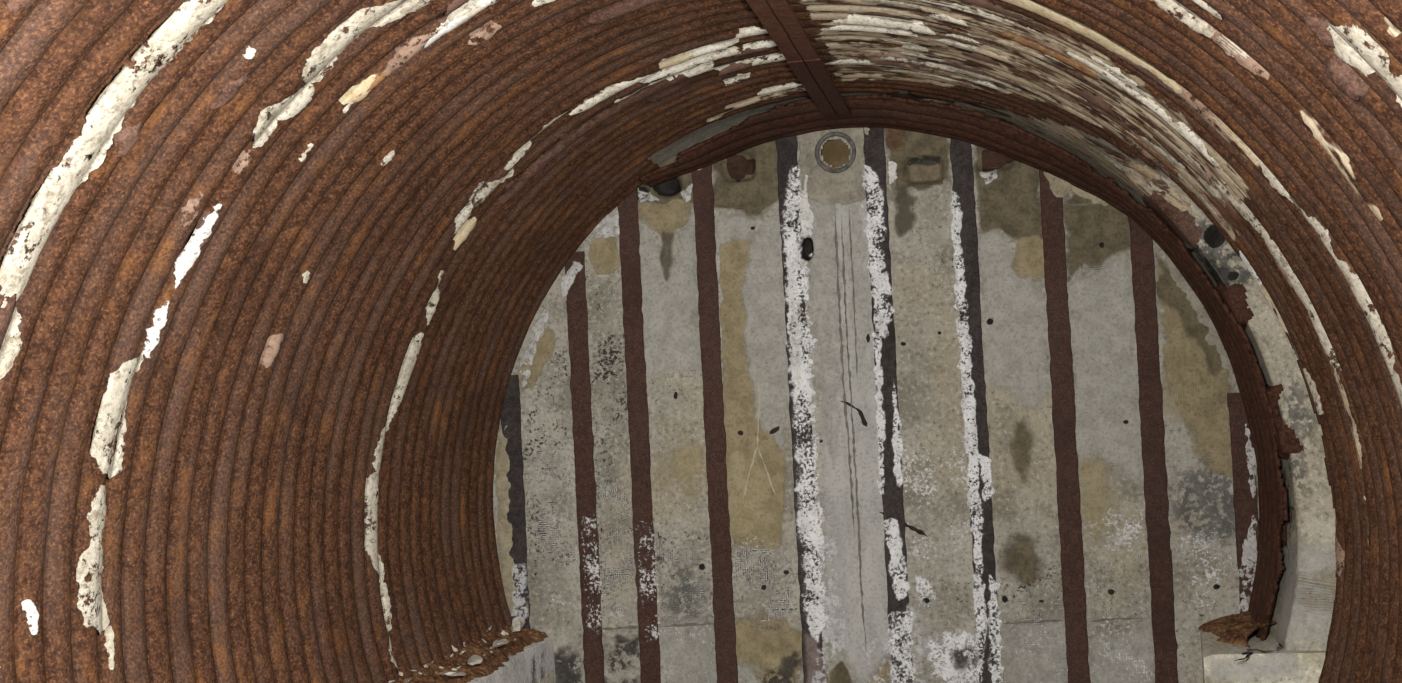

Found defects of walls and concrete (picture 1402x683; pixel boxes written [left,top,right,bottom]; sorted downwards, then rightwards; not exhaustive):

peeling [21,599,39,635]
peeling [0,0,228,379]
peeling [76,191,222,670]
peeling [232,0,502,174]
peeling [364,270,444,676]
peeling [453,26,786,250]
damp [638,155,693,279]
damp [667,568,699,616]
damp [713,128,1044,683]
rust [639,93,1304,641]
damp [1063,194,1131,281]
peeling [801,0,1402,469]